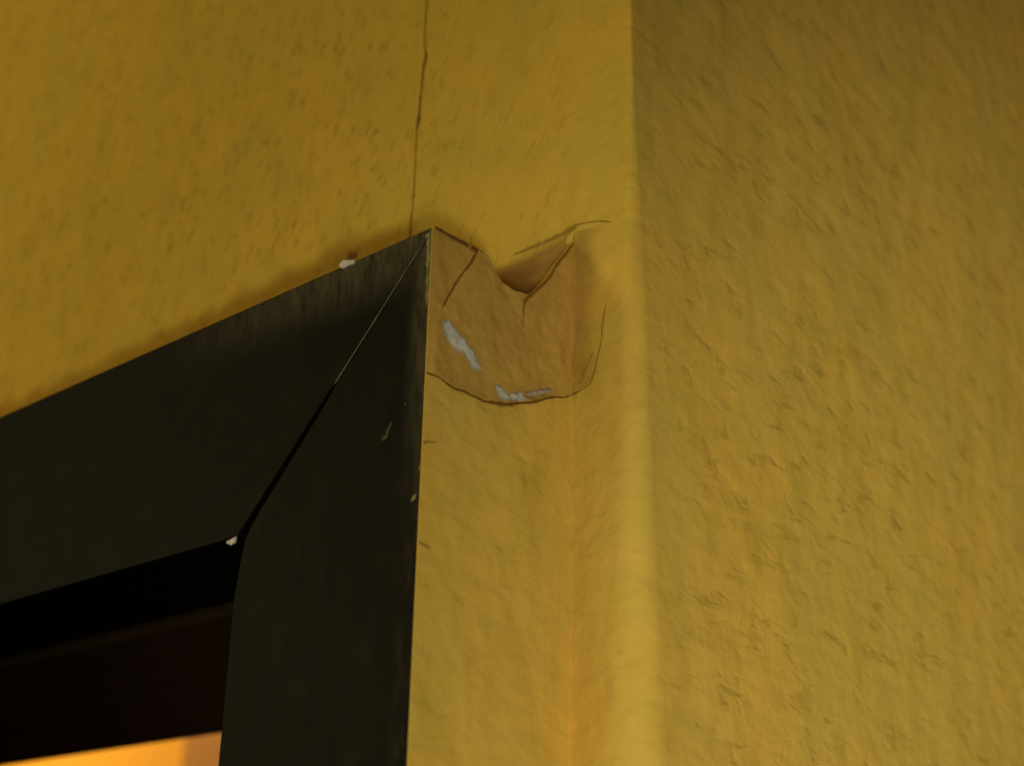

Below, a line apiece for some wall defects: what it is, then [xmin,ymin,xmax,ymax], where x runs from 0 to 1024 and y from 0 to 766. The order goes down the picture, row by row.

crack [334,0,491,384]
spalling [443,320,481,370]
spalling [496,385,553,401]